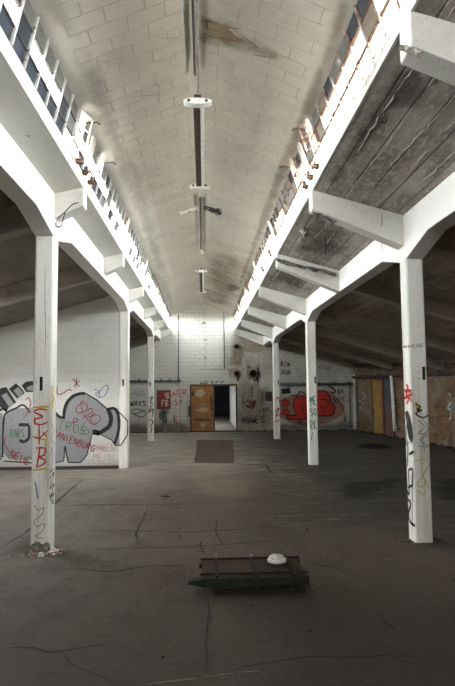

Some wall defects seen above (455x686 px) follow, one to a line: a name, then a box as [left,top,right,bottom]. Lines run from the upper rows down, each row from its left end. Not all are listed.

crack [103,503,295,556]